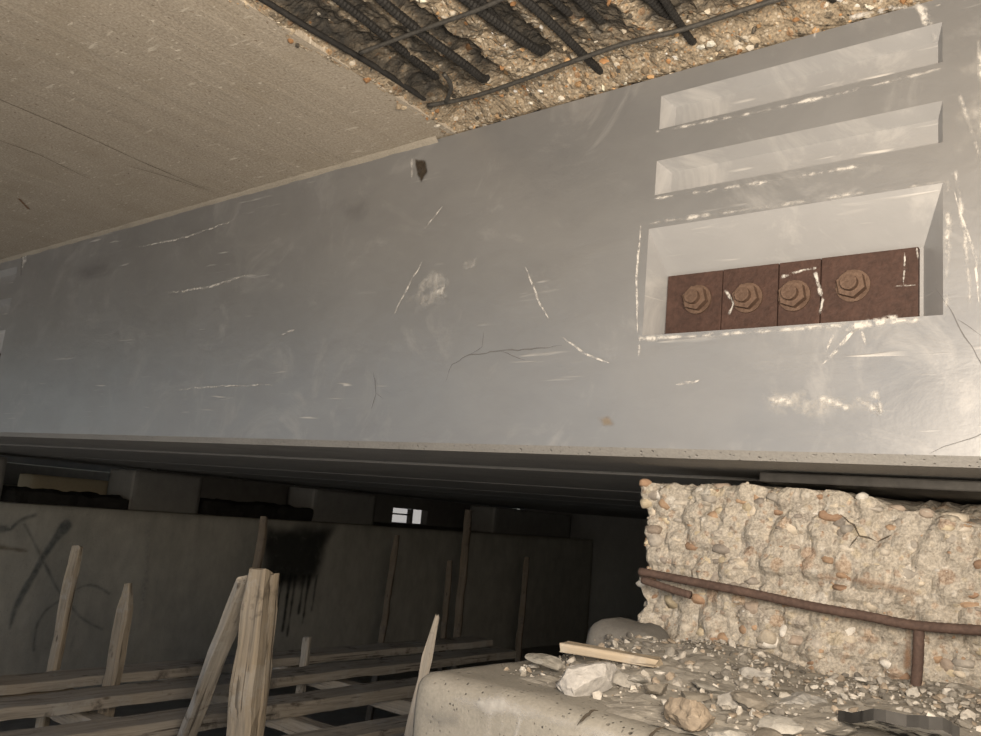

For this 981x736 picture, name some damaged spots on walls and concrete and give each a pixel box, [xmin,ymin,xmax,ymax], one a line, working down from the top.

spalling [227,0,932,136]
crack [449,340,560,370]
crack [938,292,981,363]
damp [265,529,330,635]
rust [638,567,981,686]
crack [840,514,891,546]